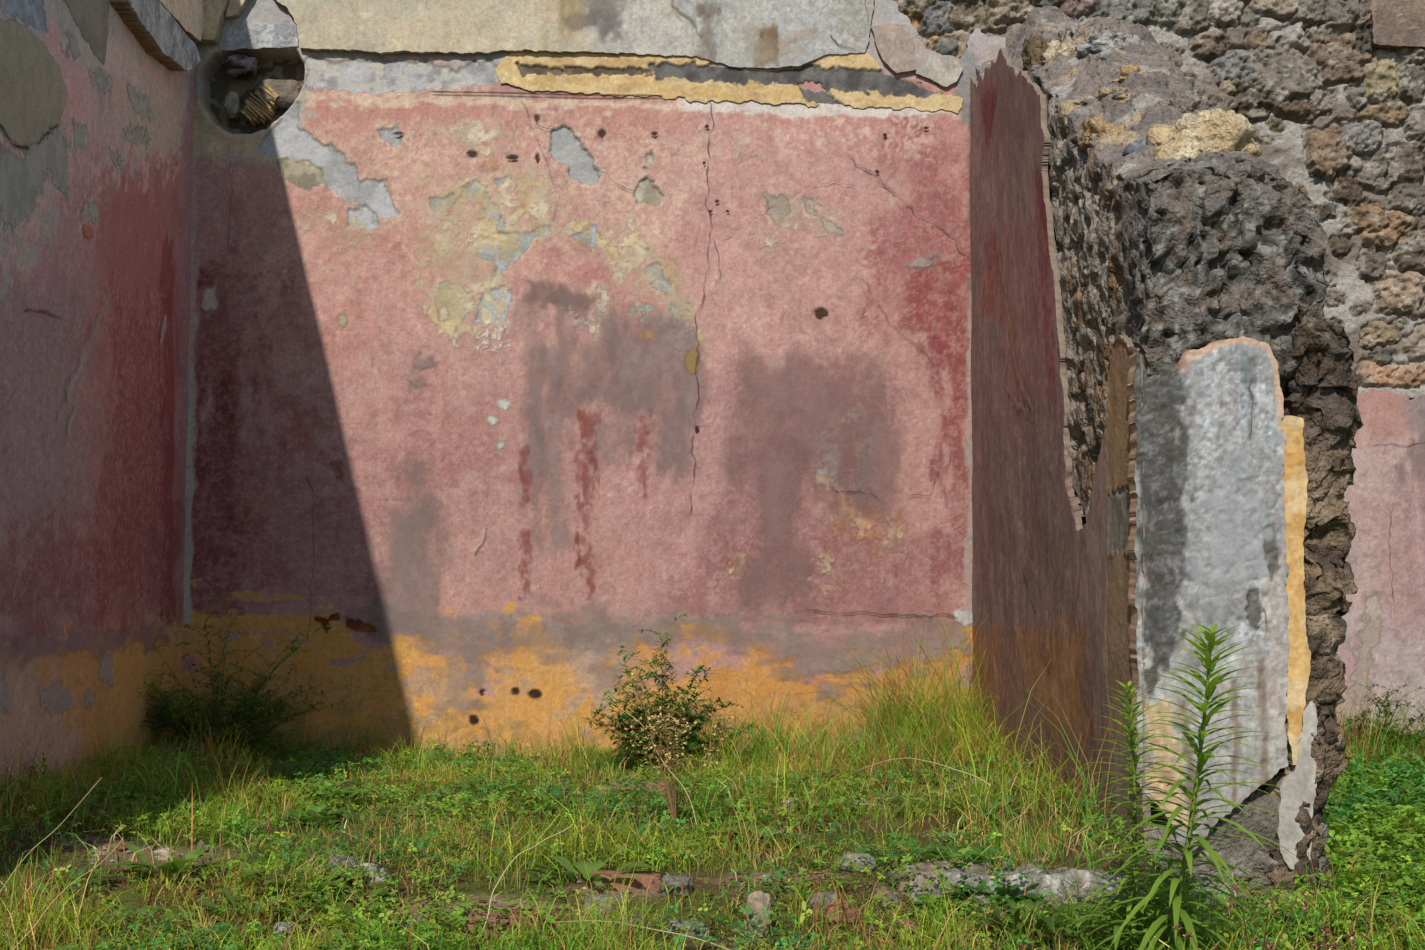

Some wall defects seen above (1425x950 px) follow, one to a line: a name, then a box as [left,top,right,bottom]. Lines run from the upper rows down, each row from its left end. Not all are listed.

peeling [0,0,48,33]
peeling [0,117,99,233]
peeling [89,67,151,176]
spalling [223,16,499,254]
peeling [416,120,706,363]
spalling [516,61,941,105]
peeling [763,192,843,236]
water stain [527,281,591,487]
water stain [578,315,701,470]
water stain [753,359,898,503]
water stain [653,456,972,699]